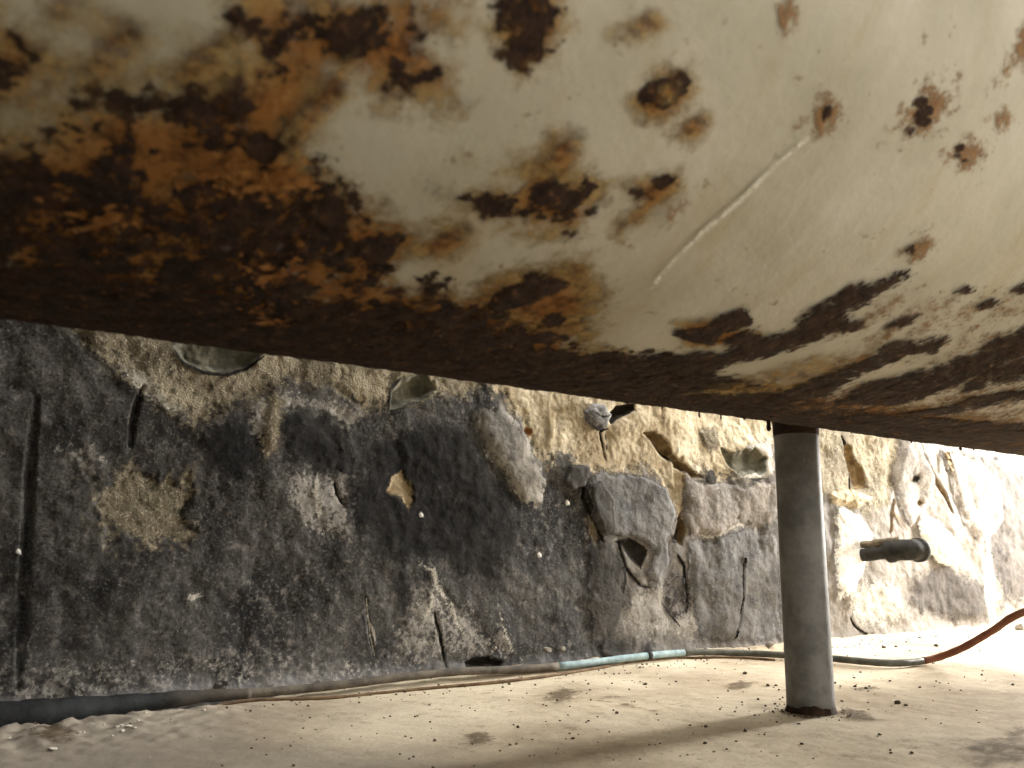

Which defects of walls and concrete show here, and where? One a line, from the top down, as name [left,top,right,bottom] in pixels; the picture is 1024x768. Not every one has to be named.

rust [0,0,1024,456]
crack [130,391,141,443]
damp [115,364,182,413]
spalling [74,328,414,458]
crack [19,398,40,640]
damp [0,391,523,701]
spalling [387,470,413,508]
spalling [409,376,783,656]
crack [735,558,747,638]
spalling [819,428,1004,544]